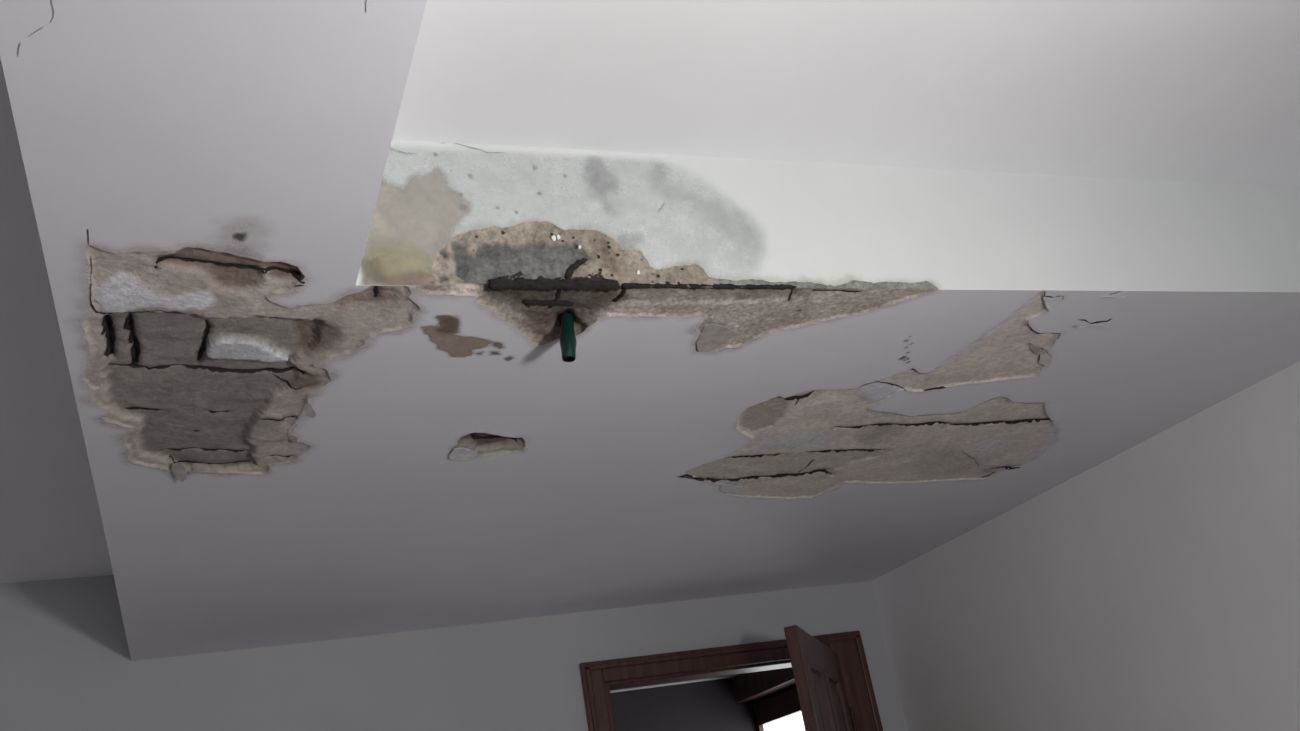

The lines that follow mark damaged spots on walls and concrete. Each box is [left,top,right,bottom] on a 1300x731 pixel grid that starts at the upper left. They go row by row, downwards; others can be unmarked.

water stain [362,154,469,286]
spalling [81,221,939,482]
flaking render [678,290,1064,499]